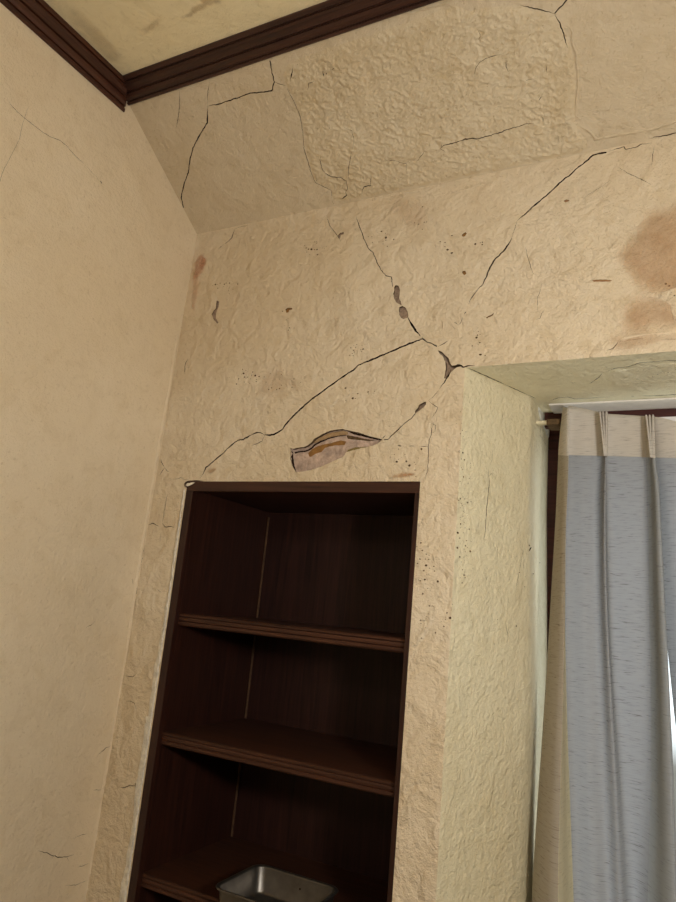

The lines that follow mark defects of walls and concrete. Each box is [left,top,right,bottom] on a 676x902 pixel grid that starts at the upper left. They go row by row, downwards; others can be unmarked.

crack [521,0,568,48]
crack [181,60,371,235]
crack [386,123,531,164]
crack [149,133,675,527]
spalling [290,429,382,472]